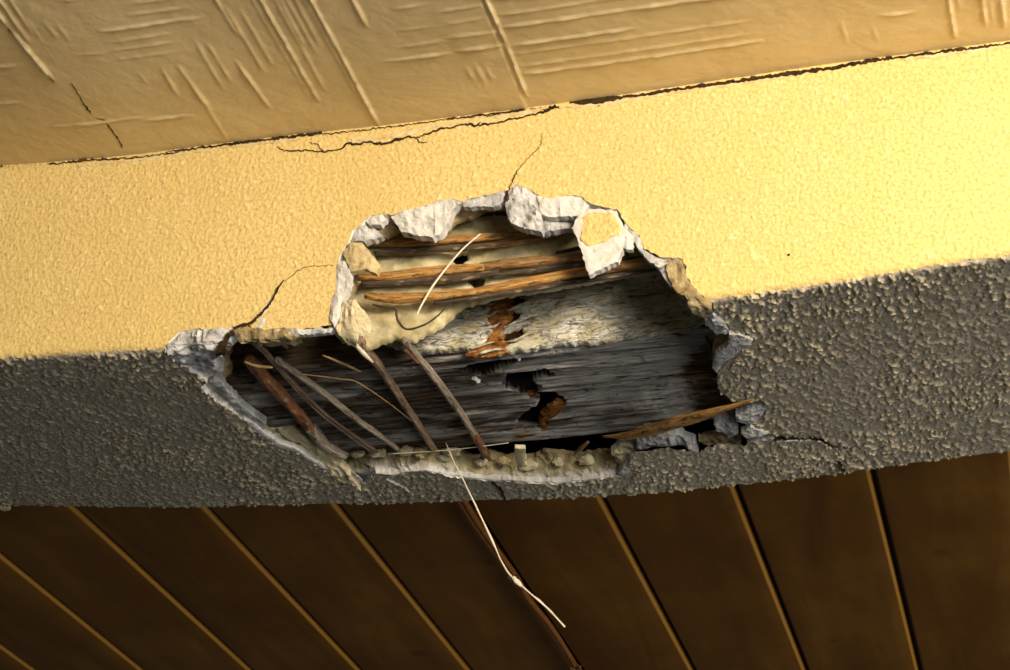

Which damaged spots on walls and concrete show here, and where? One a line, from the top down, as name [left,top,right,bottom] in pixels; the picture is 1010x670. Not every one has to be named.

crack [48,42,1010,203]
crack [216,265,333,358]
flaking render [165,184,775,491]
corrosion [465,297,525,358]
corrosion [514,397,566,438]